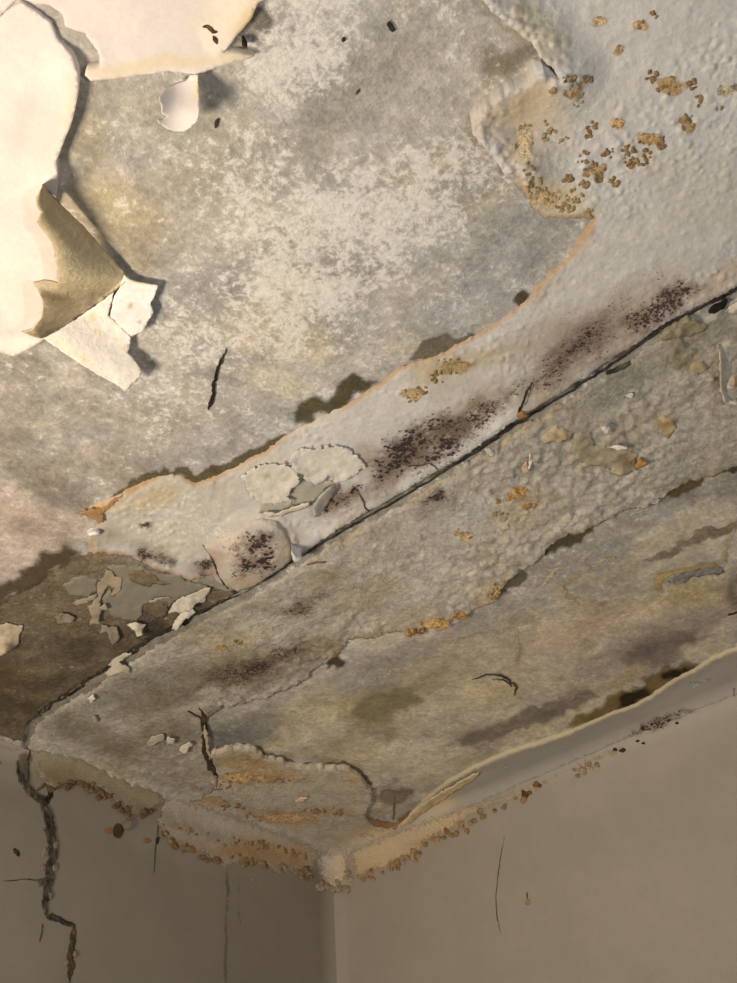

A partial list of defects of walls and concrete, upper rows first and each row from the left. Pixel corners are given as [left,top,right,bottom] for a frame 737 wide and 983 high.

peeling [0,0,264,391]
peeling [79,0,737,585]
damp [372,276,701,482]
rust [548,75,594,108]
rust [514,120,667,220]
rust [645,70,704,134]
damp [0,546,235,747]
crack [187,708,218,778]
peeling [28,298,737,857]
crack [34,287,737,725]
damp [461,633,701,746]
crack [0,750,78,983]